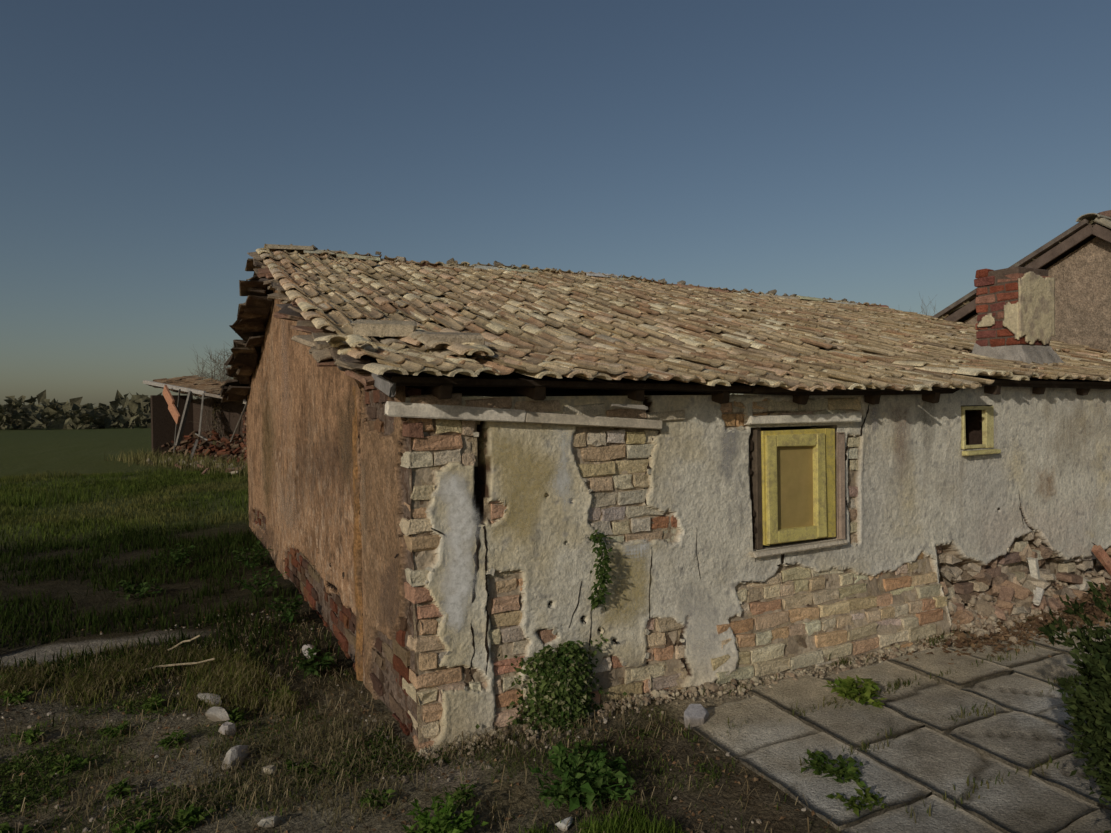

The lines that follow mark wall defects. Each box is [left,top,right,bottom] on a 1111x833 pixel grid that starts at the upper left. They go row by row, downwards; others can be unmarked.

spalling [283,385,558,752]
crack [469,440,489,682]
spalling [571,427,677,544]
spalling [580,616,689,708]
spalling [711,530,1111,685]